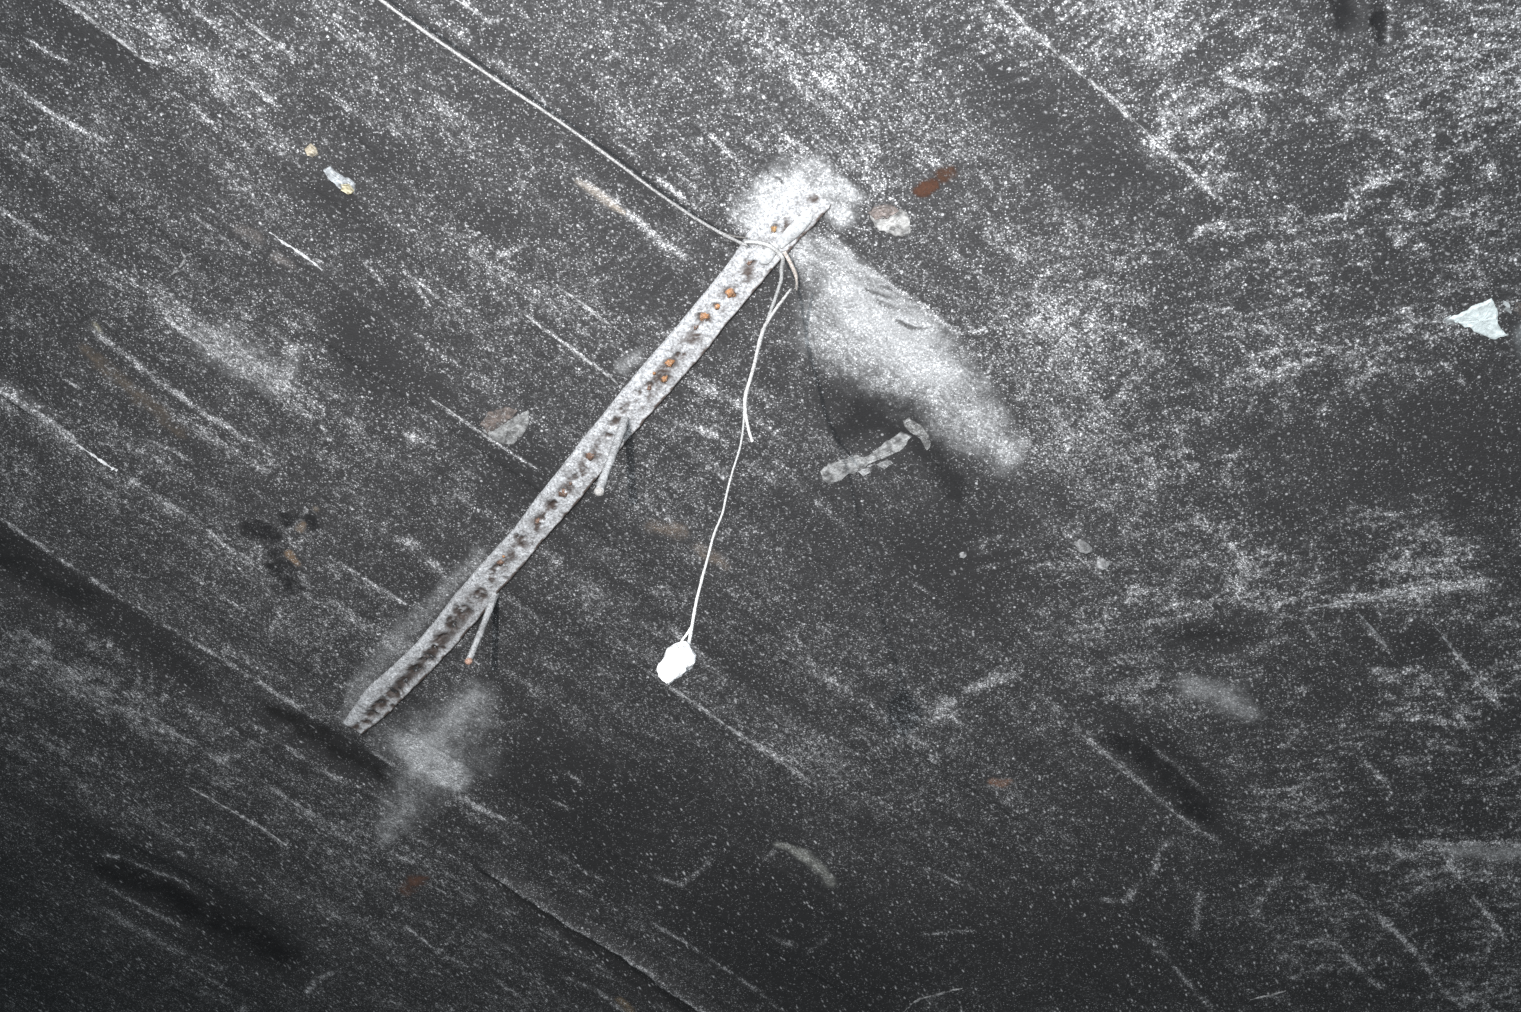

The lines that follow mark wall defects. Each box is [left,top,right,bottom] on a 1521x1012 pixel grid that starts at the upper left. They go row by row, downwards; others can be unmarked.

corrosion [914,167,954,197]
corrosion [694,288,736,330]
damp [733,159,1022,499]
corrosion [647,359,675,390]
spalling [480,407,529,444]
peeling [820,417,931,485]
damp [376,694,492,829]